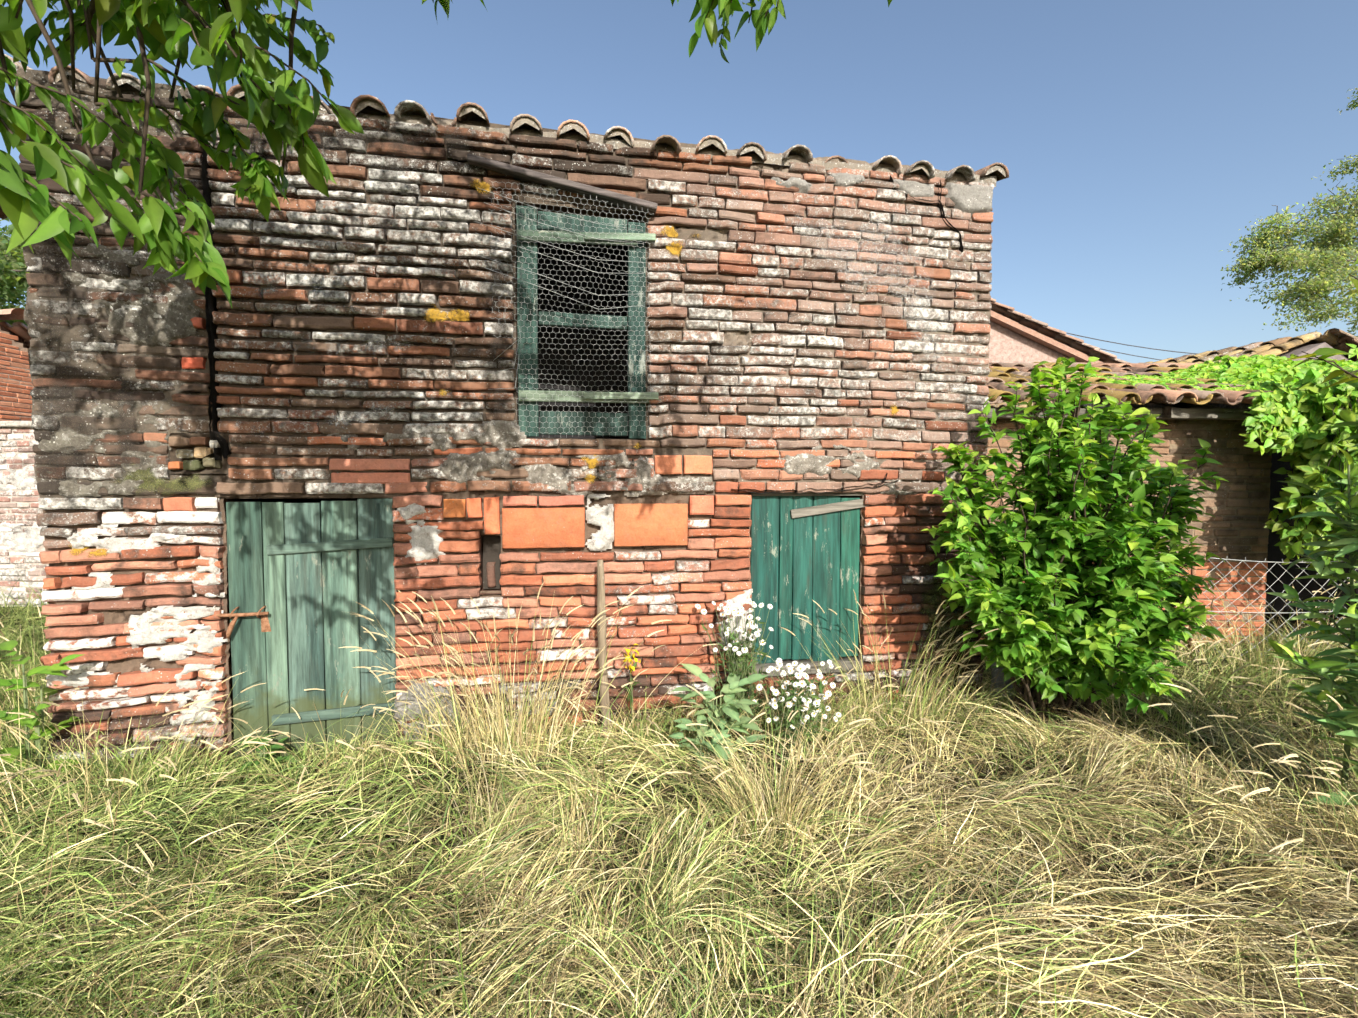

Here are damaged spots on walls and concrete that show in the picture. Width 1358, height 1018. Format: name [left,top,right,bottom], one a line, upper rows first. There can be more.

water stain [38,243,83,481]
flaking render [397,503,445,565]
flaking render [126,555,228,742]